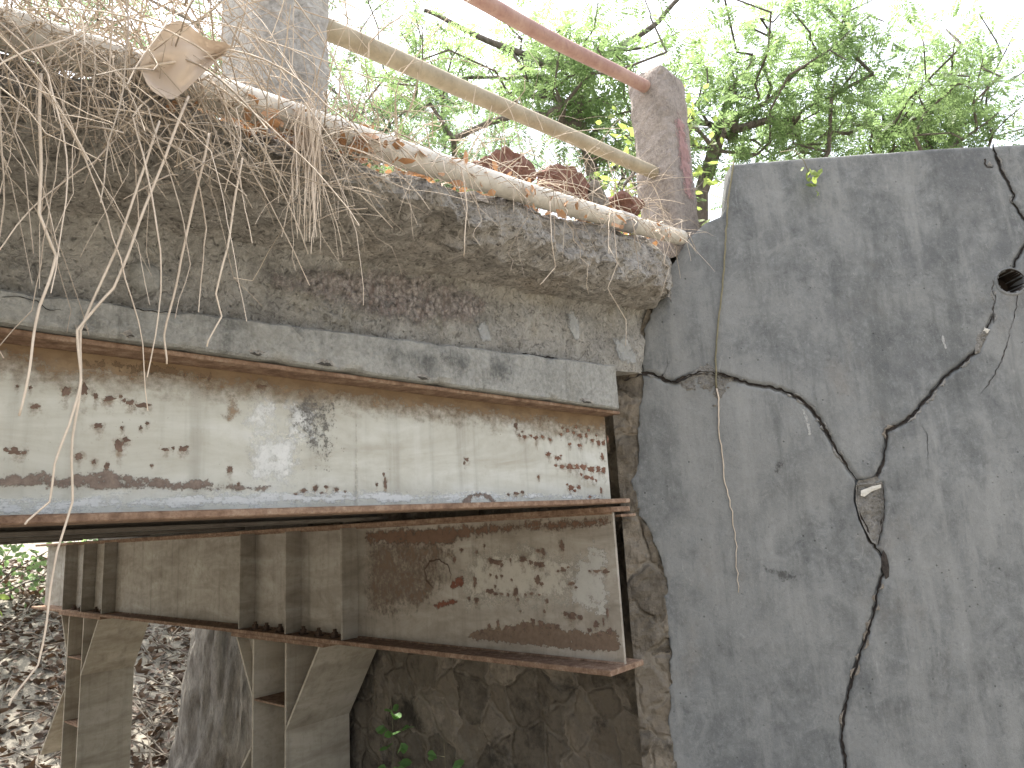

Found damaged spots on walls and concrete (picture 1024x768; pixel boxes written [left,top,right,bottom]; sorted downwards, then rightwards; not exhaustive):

crack [992,144,1024,220]
crack [984,246,1024,389]
corrosion [0,343,609,499]
corrosion [365,517,621,652]
crack [624,351,975,768]